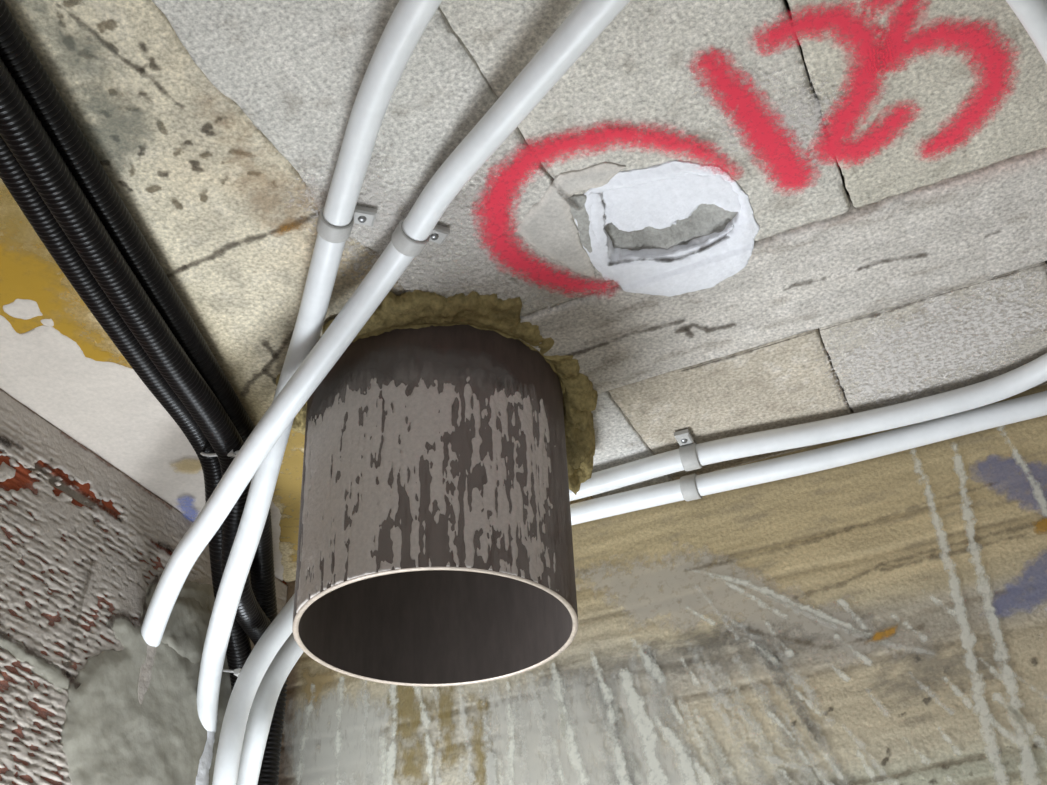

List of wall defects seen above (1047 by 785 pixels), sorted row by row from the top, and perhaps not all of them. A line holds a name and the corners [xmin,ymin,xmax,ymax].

crack [58,5,180,107]
crack [167,214,319,277]
spalling [516,162,626,279]
flaking render [0,299,206,785]
flaking render [186,543,213,587]
flaking render [270,501,288,615]
leakage [273,429,305,562]
leakage [381,684,398,785]
leakage [415,686,434,785]
leakage [552,663,588,785]
leakage [640,648,664,682]
leakage [593,657,735,785]